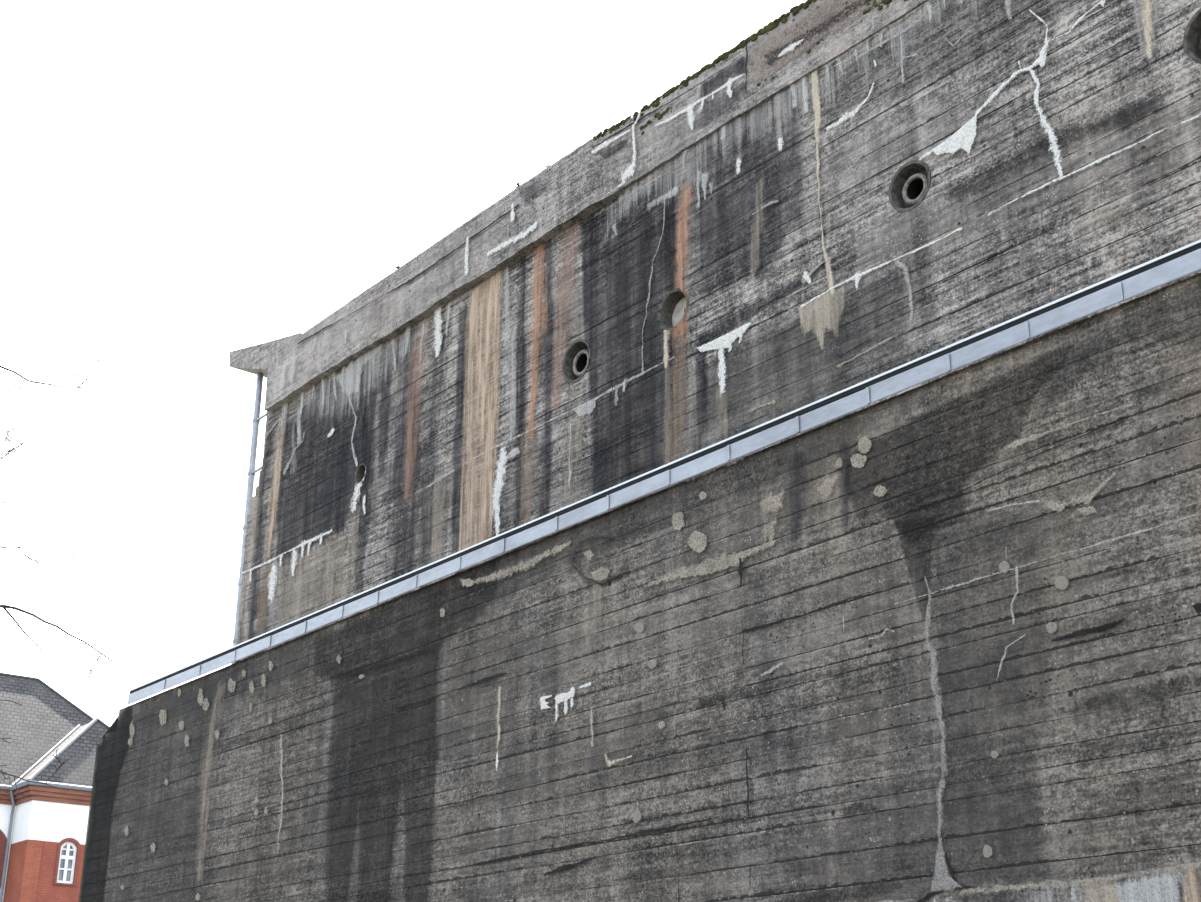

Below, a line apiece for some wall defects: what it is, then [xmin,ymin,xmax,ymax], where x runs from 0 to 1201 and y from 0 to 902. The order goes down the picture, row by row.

crack [975,0,1105,177]
water stain [242,302,451,637]
corrosion [459,270,502,551]
corrosion [522,224,577,443]
water stain [485,77,809,536]
corrosion [663,312,686,464]
corrosion [676,187,692,290]
water stain [799,228,962,348]
water stain [1007,404,1132,449]
crack [737,558,745,586]
crack [742,514,1199,902]
water stain [961,861,1201,902]